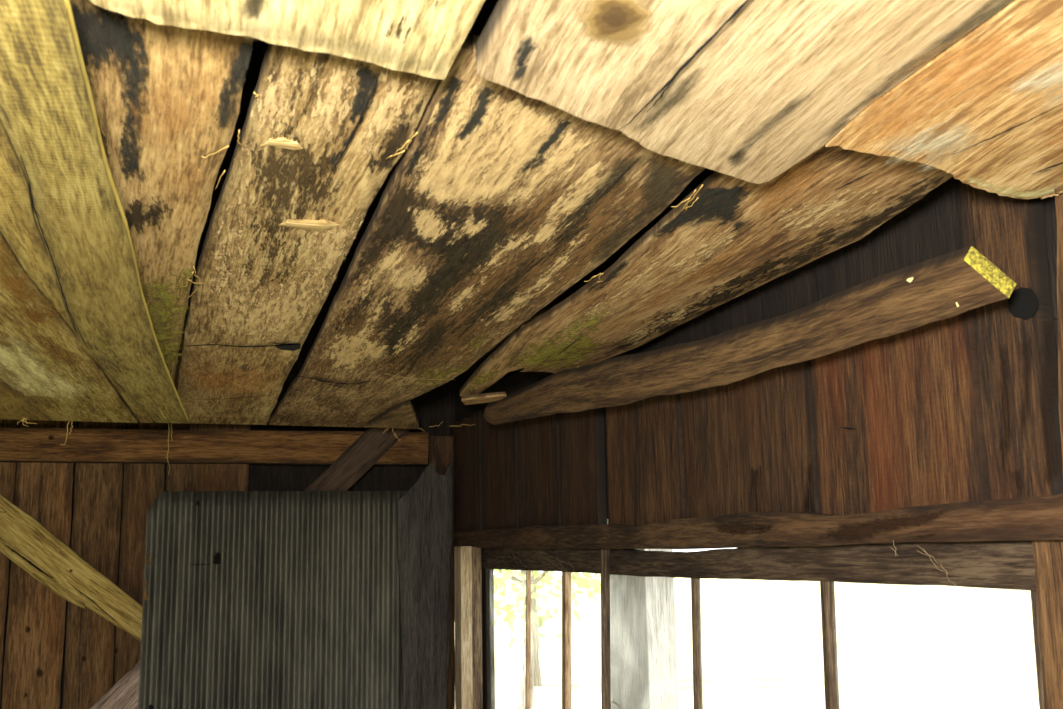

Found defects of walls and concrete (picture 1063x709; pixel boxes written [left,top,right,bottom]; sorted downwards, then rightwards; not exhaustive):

damp [70,3,151,186]
damp [209,43,253,135]
damp [513,37,536,80]
damp [649,82,688,122]
crack [619,0,749,130]
damp [125,195,173,236]
damp [234,55,382,303]
damp [333,77,636,373]
damp [595,159,681,262]